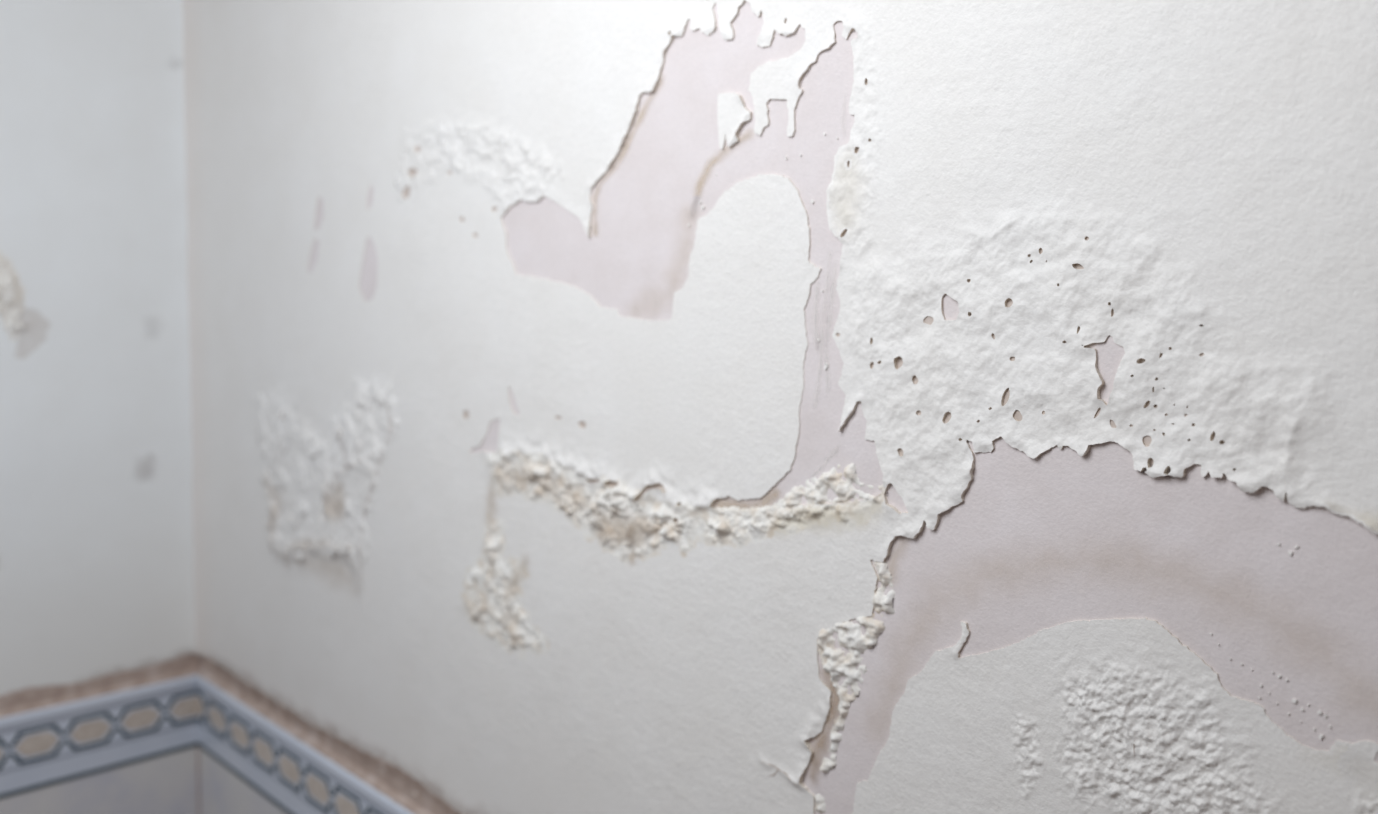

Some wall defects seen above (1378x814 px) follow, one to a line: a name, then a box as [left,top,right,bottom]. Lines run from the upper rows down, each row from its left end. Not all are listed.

peeling [0,252,51,359]